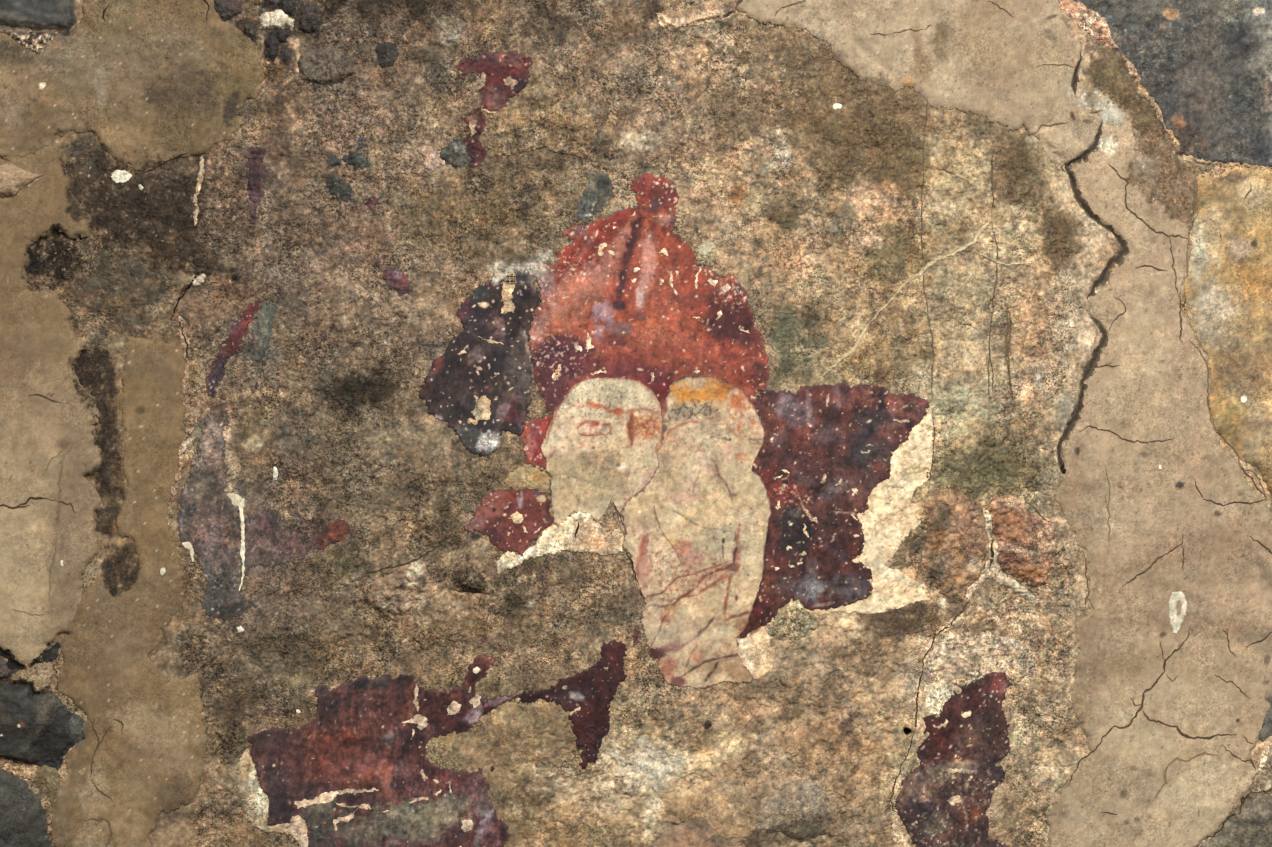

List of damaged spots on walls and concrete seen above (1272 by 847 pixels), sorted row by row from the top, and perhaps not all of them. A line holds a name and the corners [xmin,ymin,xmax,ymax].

peeling [656,0,743,31]
crack [1032,53,1267,608]
flaking render [1059,0,1272,510]
crack [0,444,97,615]
flaking render [497,512,624,574]
flaking render [737,408,1057,679]
flaking render [0,642,85,847]
flaking render [236,749,291,835]
flaking render [660,773,831,842]
flaking render [922,631,1038,715]
crack [1067,626,1271,840]
flaking render [1257,693,1272,796]